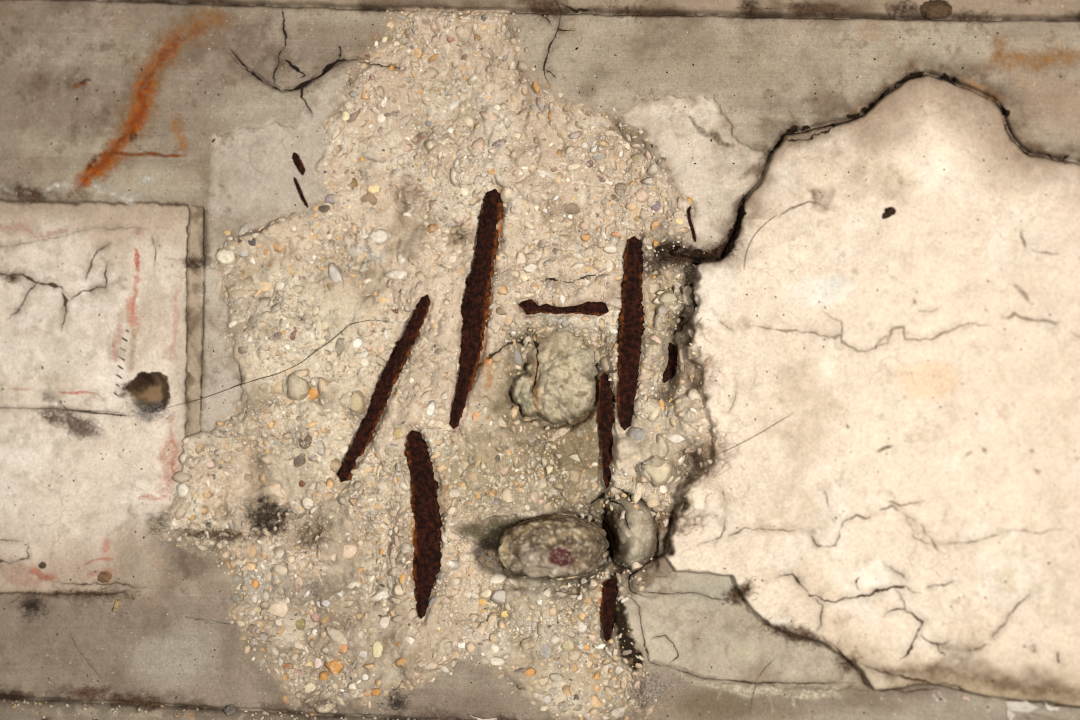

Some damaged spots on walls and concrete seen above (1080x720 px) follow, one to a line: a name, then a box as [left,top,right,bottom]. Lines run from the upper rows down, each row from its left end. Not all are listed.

corrosion [80,37,186,186]
crack [236,11,400,113]
crack [542,0,588,78]
crack [759,65,1073,173]
crack [0,246,108,326]
crack [32,402,126,416]
spalling [148,8,872,720]
crack [655,195,748,335]
crack [763,311,1080,352]
crack [720,492,1041,551]
crack [591,488,981,695]
crack [1008,700,1080,708]